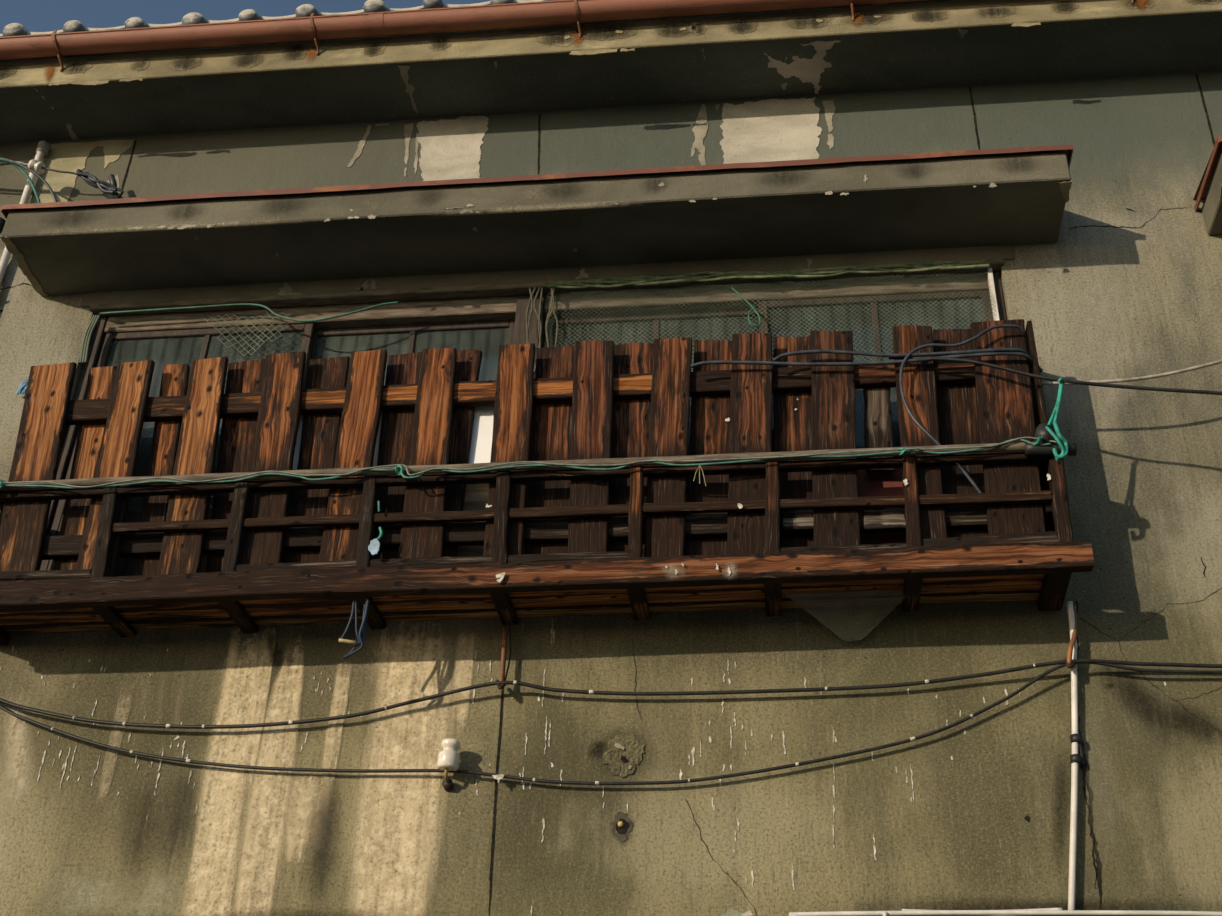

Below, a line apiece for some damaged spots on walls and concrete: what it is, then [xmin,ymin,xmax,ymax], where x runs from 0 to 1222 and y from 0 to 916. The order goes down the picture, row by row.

peeling [31,124,134,203]
peeling [347,123,389,168]
peeling [397,64,489,181]
peeling [691,40,841,165]
crack [1075,558,1222,733]
leakage [38,627,362,916]
leakage [351,621,493,916]
crack [489,688,504,916]
spalling [593,733,645,777]
leakage [679,698,753,784]
crack [685,799,757,916]
crack [1078,703,1102,910]